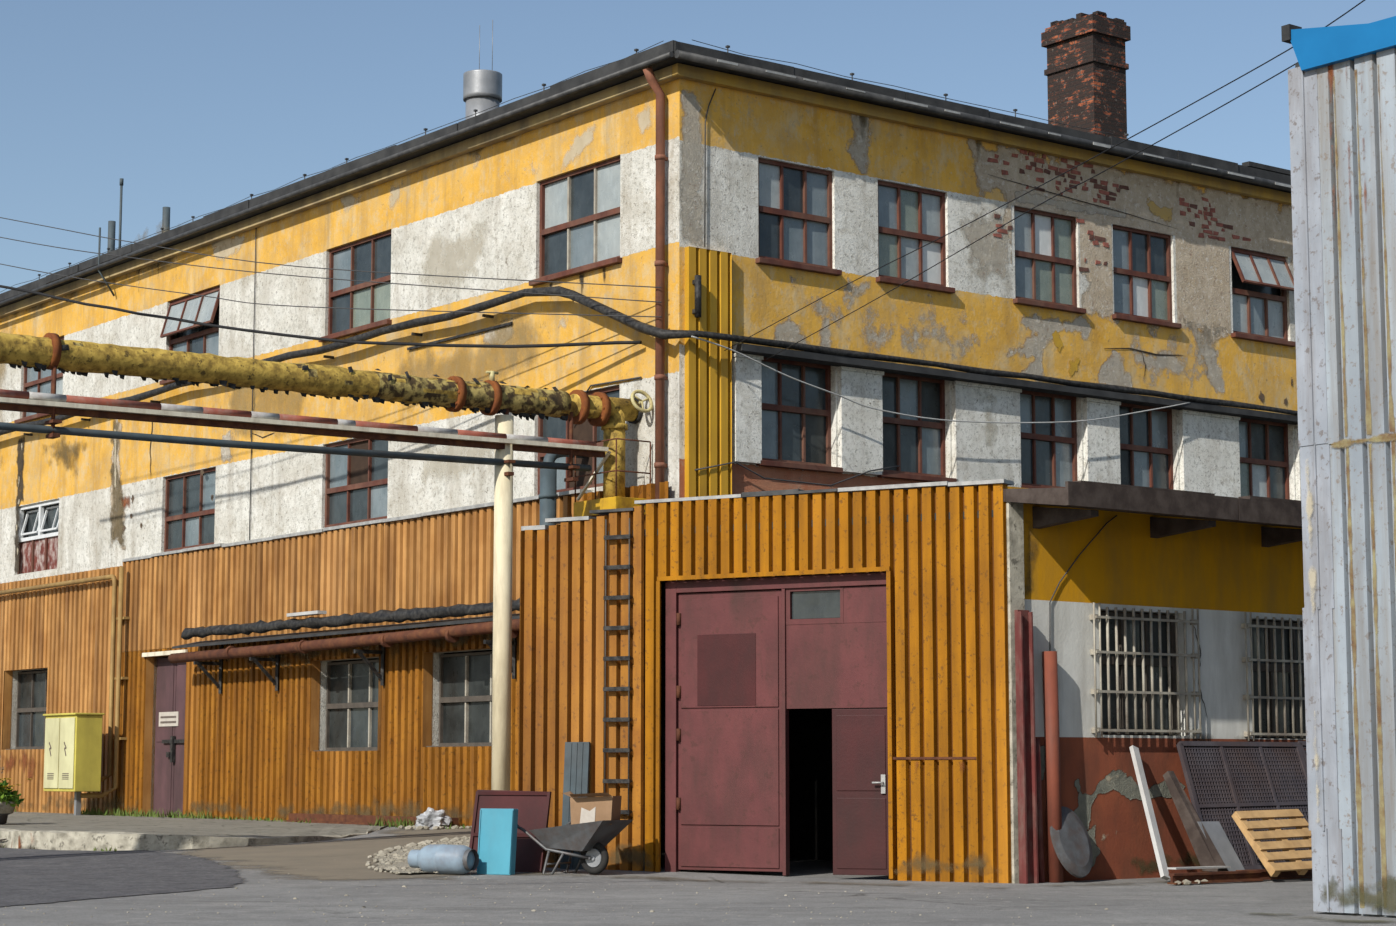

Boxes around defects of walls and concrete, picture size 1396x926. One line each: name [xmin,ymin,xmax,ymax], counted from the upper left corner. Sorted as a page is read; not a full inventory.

peeling [848,114,871,174]
peeling [774,278,976,356]
spalling [961,138,1293,395]
leakage [14,438,25,572]
leakage [110,419,126,550]
spalling [1074,769,1185,867]